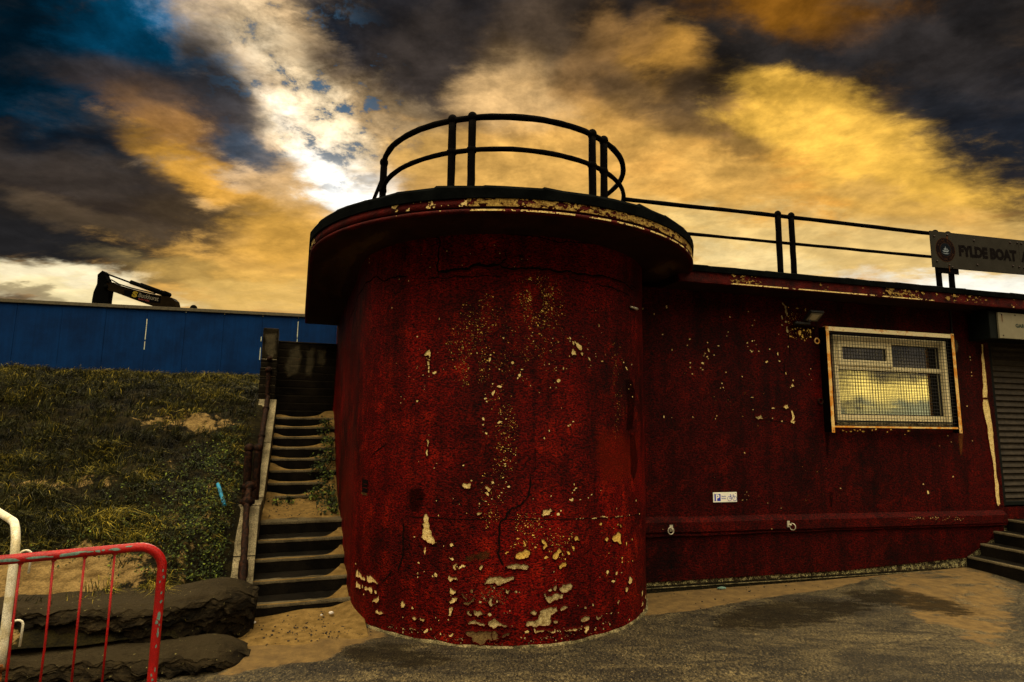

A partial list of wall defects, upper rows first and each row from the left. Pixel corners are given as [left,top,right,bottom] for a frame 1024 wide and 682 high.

peeling [392,198,694,262]
crack [348,237,635,324]
peeling [731,274,986,303]
peeling [747,302,814,388]
peeling [417,277,632,529]
peeling [751,393,796,425]
peeling [971,344,1001,507]
crack [382,450,639,583]
peeling [355,483,646,646]